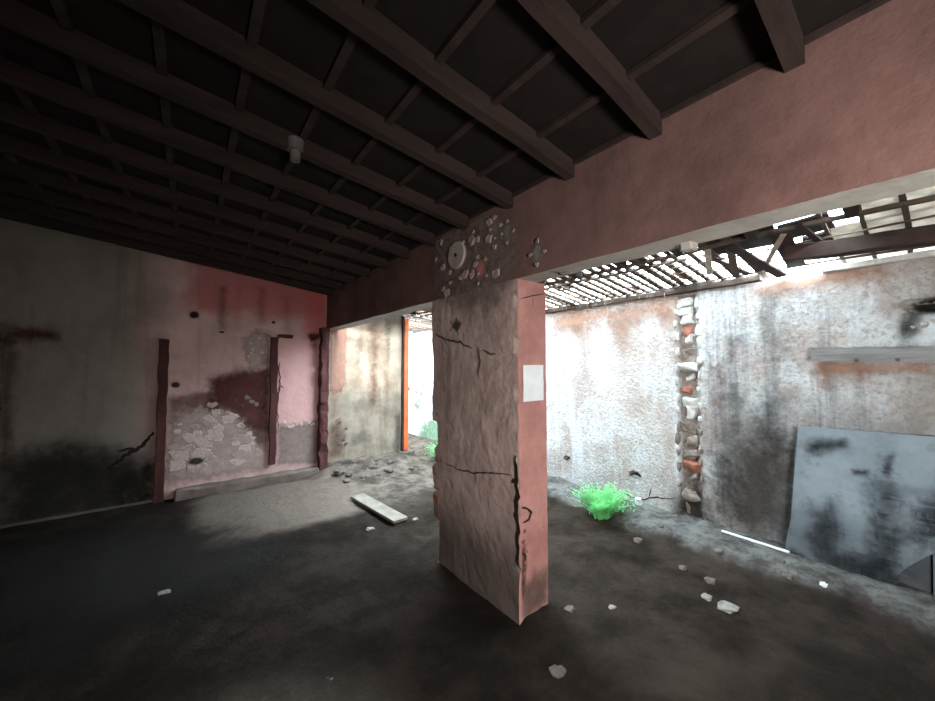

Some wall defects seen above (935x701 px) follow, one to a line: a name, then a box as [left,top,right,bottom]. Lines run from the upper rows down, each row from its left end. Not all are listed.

crack [436,334,496,374]
leakage [902,306,935,333]
leakage [4,445,152,524]
crack [115,432,154,465]
flaking render [166,402,264,480]
leakage [172,369,269,443]
spalling [277,420,317,464]
crack [445,455,532,566]
spalling [673,295,704,514]
leakage [723,432,793,538]